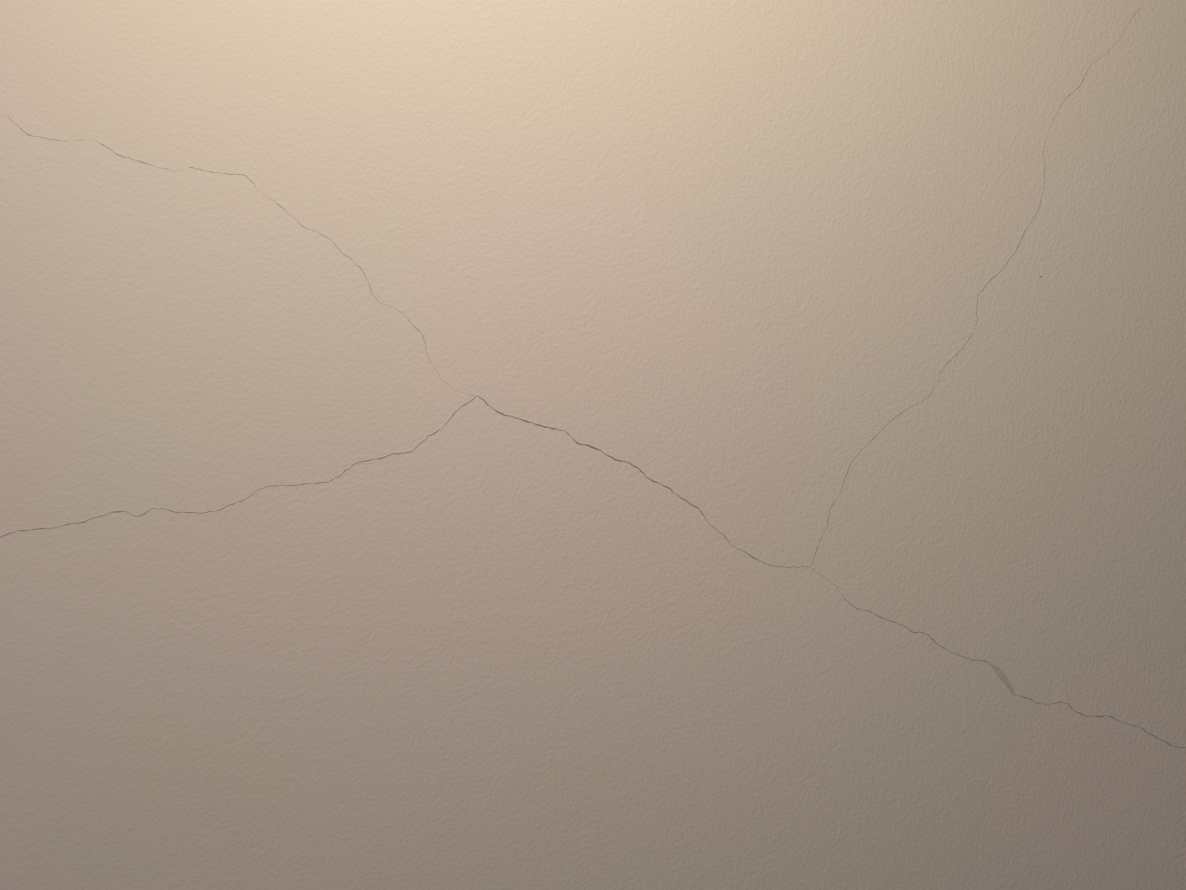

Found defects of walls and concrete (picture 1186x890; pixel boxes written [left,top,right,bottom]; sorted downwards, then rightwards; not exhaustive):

crack [0,3,1144,665]
crack [987,662,1186,749]